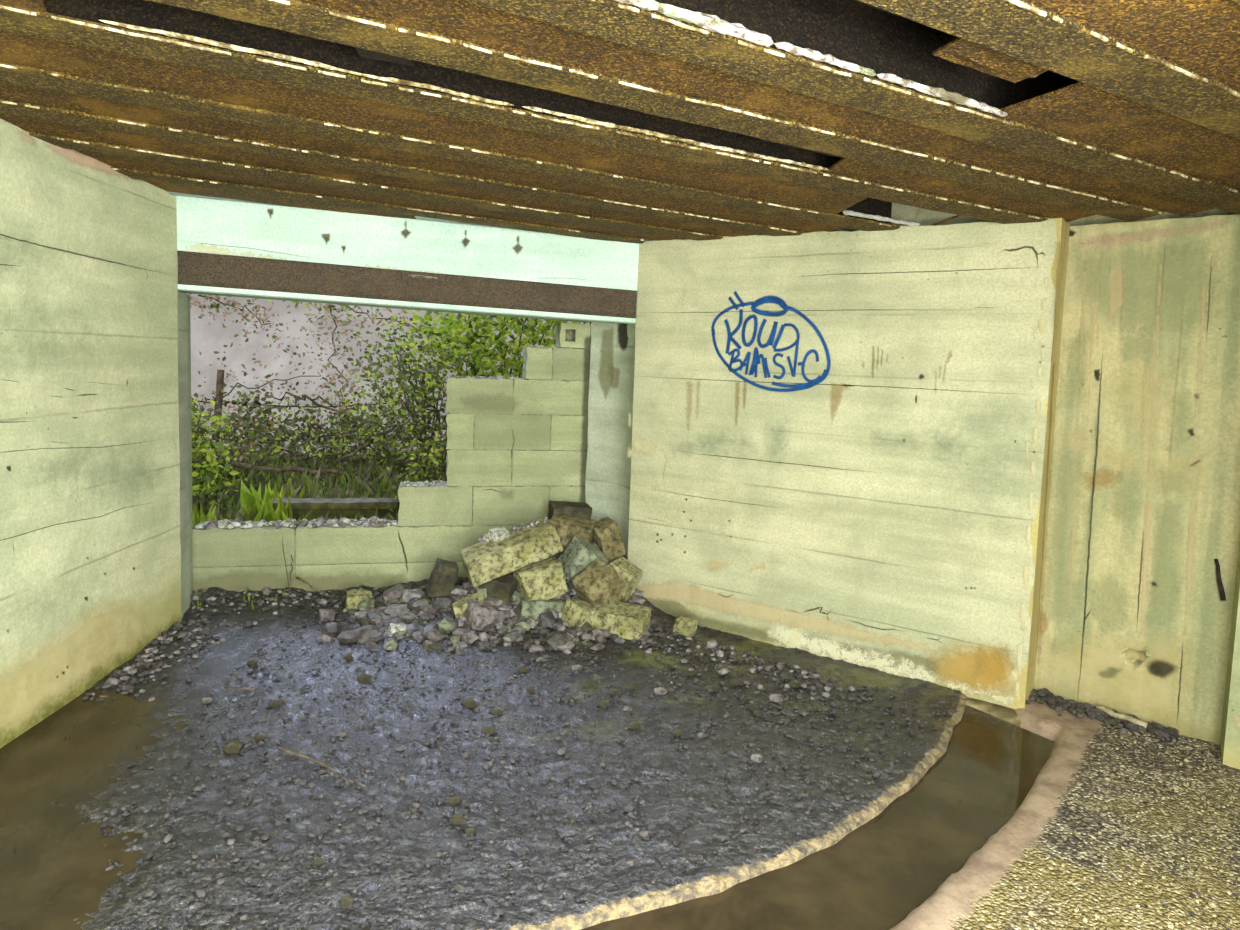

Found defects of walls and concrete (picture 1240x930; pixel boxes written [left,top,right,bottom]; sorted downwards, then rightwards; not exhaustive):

rust [0,0,48,13]
rust [296,0,1240,222]
damp [0,610,142,728]
damp [646,598,1013,705]